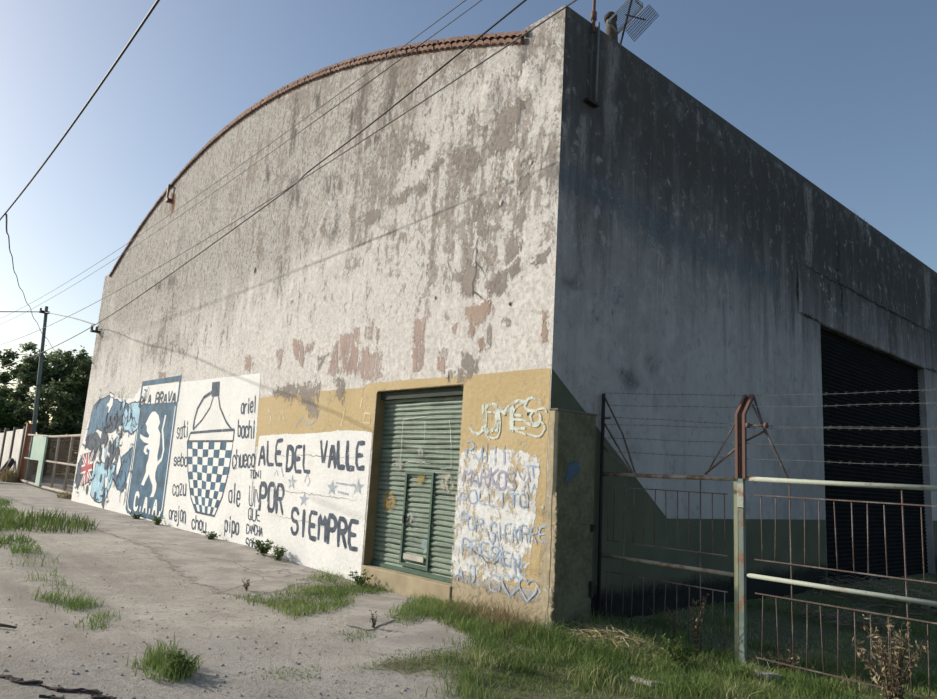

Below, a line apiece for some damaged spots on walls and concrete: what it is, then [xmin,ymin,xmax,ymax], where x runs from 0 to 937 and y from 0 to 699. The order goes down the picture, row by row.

flaking render [362,98,526,227]
flaking render [472,197,505,240]
flaking render [437,206,552,384]
crack [797,239,929,331]
peeling [273,326,383,418]
peeling [411,315,426,372]